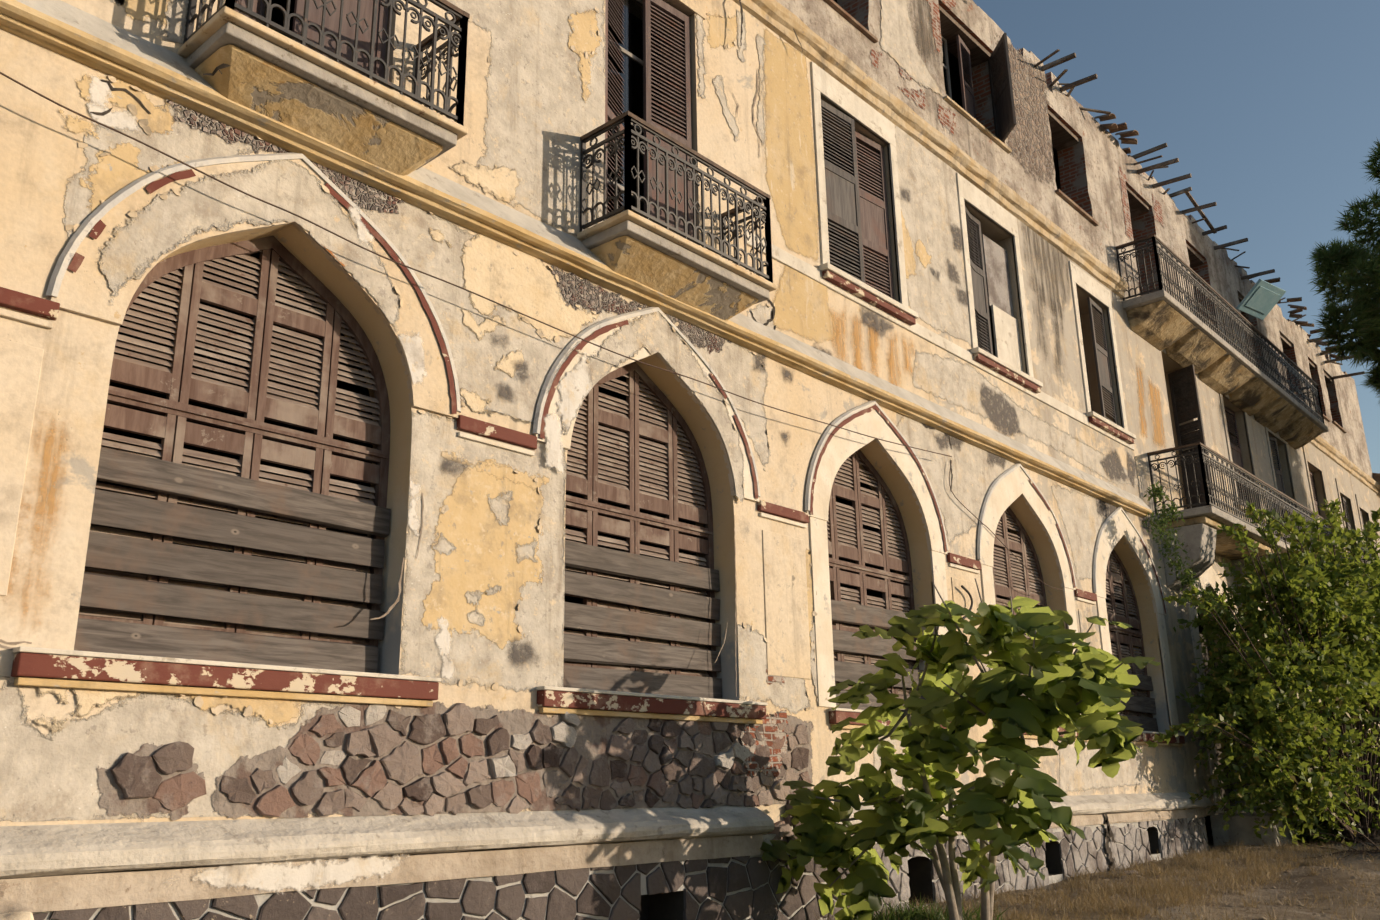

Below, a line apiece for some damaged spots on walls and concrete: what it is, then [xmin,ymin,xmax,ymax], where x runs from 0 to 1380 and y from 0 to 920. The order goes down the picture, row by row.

peeling [110,0,189,44]
crack [90,80,151,116]
peeling [447,0,606,235]
flaking render [0,74,838,822]
crack [0,639,32,678]